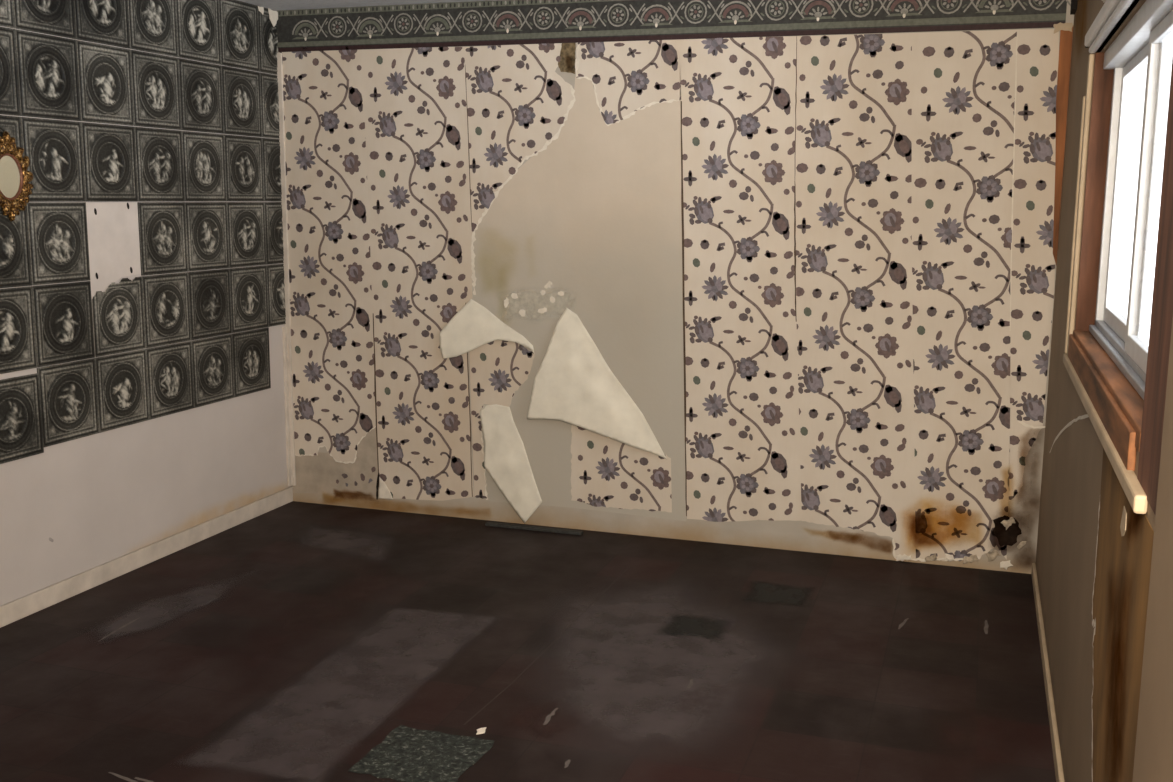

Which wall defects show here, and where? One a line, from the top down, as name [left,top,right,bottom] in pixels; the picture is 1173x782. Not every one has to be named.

peeling [86,203,141,299]
peeling [504,281,564,317]
water stain [911,517,931,543]